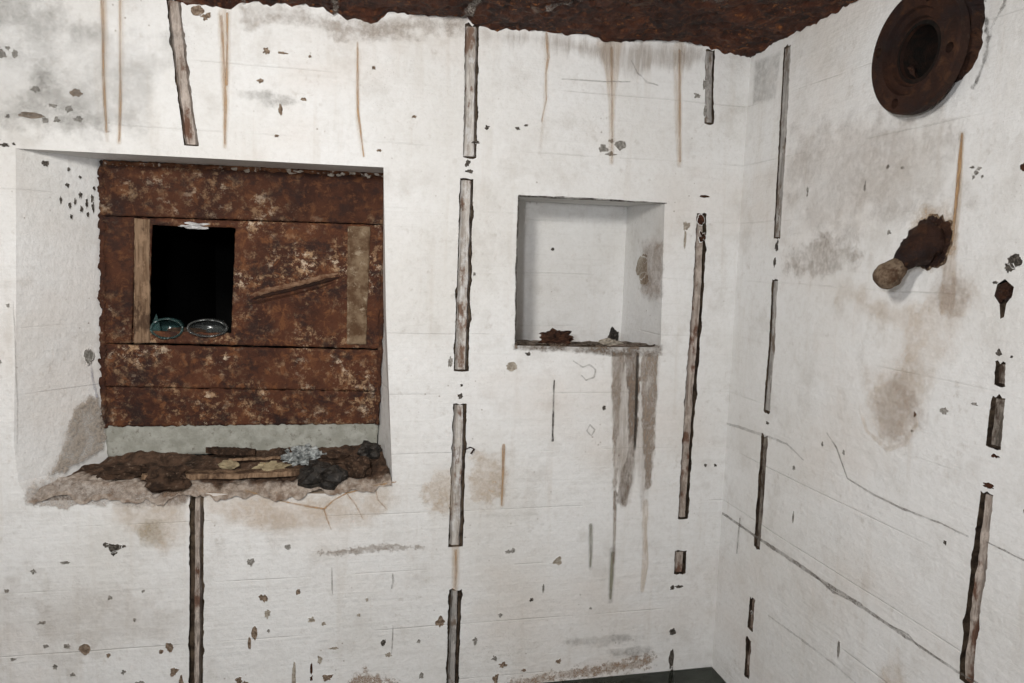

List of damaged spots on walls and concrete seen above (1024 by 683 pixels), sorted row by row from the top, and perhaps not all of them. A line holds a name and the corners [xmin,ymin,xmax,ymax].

peeling [190,5,212,21]
rust [954,0,985,83]
rust [97,160,108,429]
rust [374,223,384,425]
peeling [683,214,706,251]
peeling [26,394,118,509]
damp [515,344,661,488]
crack [722,512,975,682]